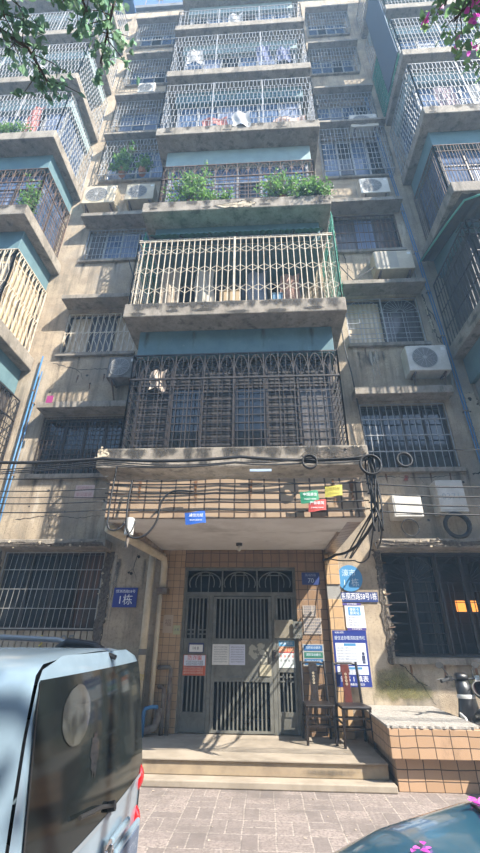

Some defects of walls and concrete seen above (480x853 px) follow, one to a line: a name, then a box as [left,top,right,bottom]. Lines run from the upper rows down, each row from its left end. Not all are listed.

spalling [0,540,119,644]
spalling [371,537,480,665]